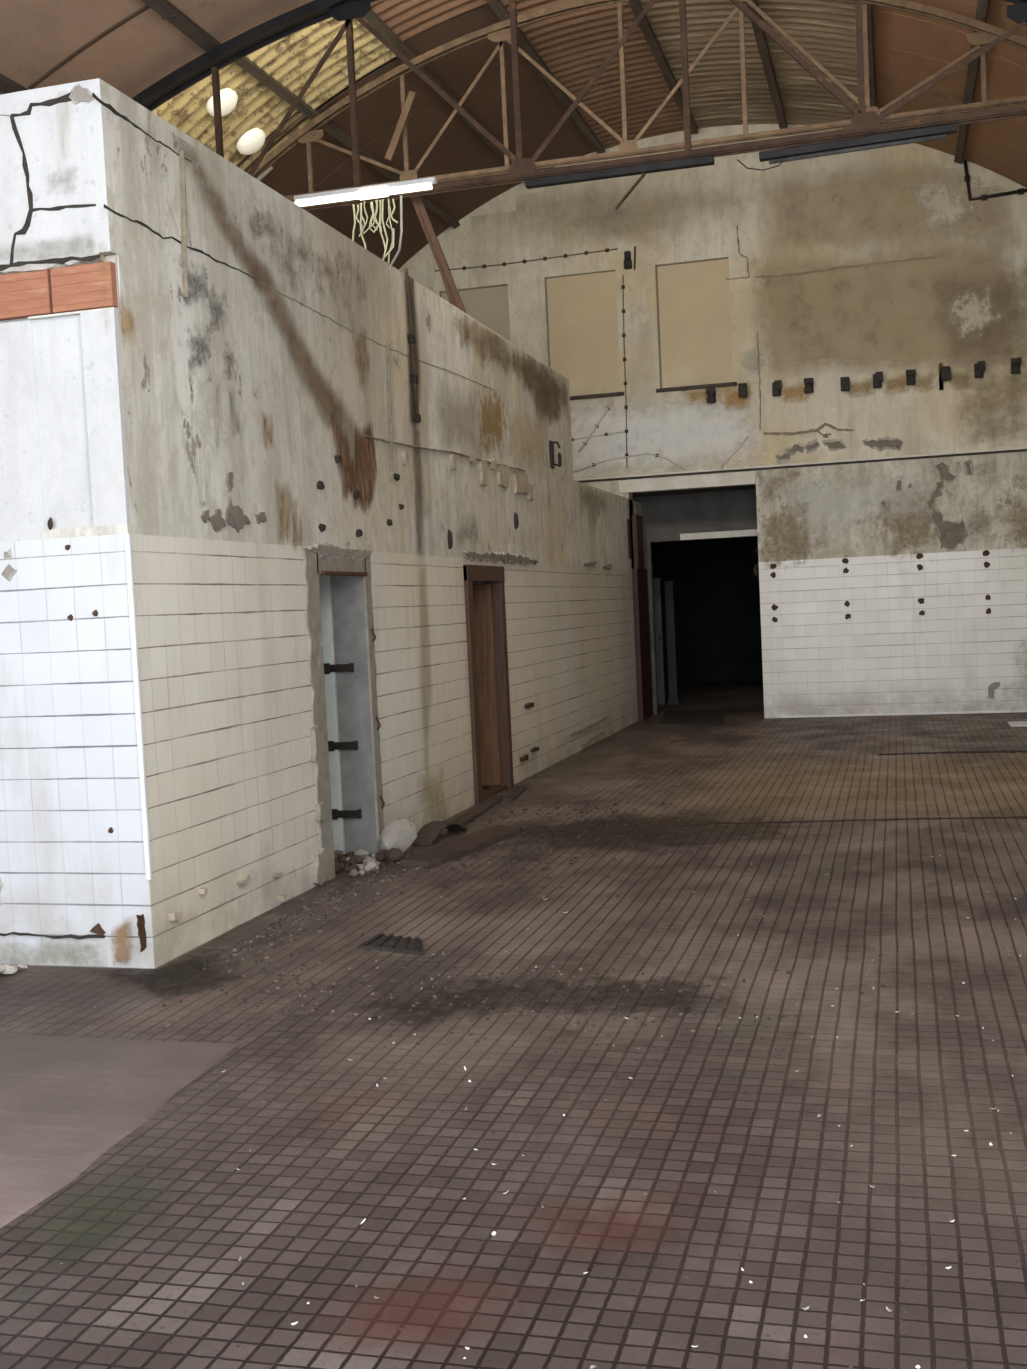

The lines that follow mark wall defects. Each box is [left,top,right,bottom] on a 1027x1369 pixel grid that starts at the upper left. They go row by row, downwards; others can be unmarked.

crack [0,92,526,482]
peeling [200,472,267,533]
rust [332,418,377,509]
flaking render [925,459,974,552]
spalling [136,914,147,952]